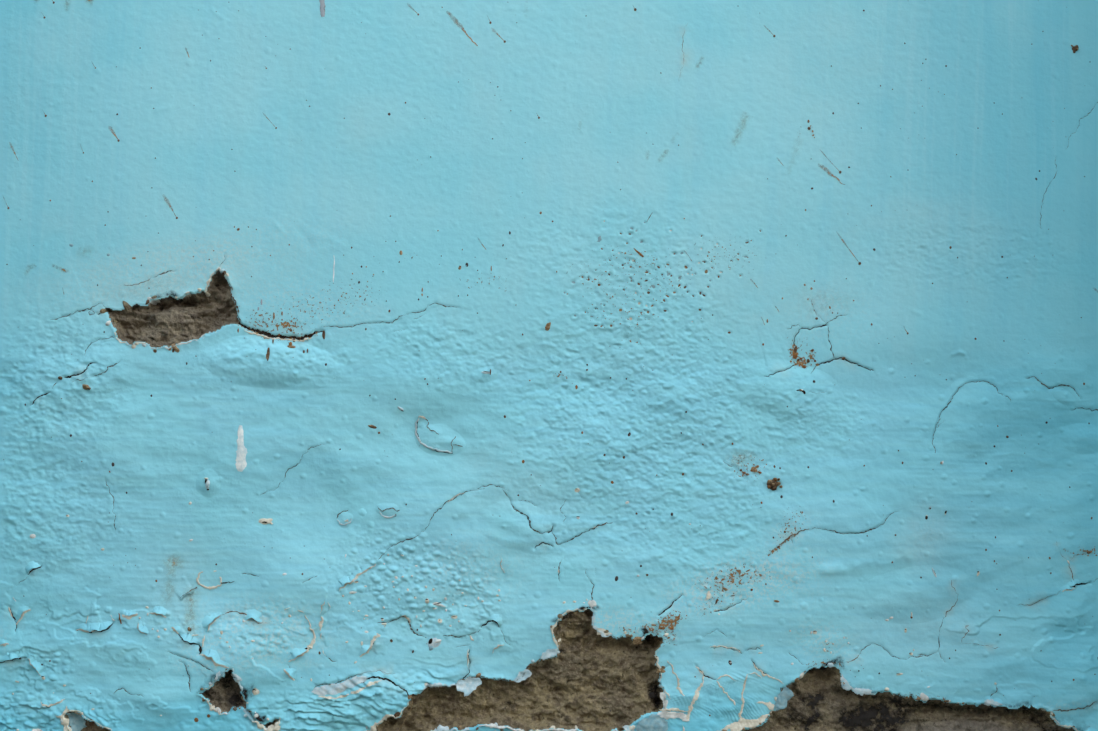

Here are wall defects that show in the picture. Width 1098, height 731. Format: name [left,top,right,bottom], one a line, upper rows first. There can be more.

spalling [100,267,241,352]
crack [238,303,454,342]
crack [767,304,872,394]
crack [932,376,1098,453]
crack [75,484,613,695]
spalling [56,706,112,731]
spalling [199,669,281,731]
peeling [310,676,382,699]
spalling [722,631,1079,731]